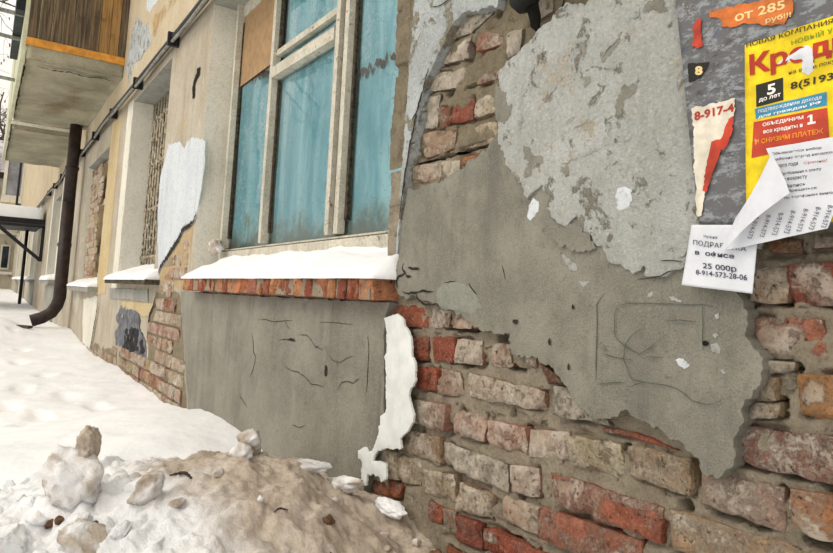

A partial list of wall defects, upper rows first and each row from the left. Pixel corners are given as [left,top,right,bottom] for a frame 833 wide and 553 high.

flaking render [82,137,206,409]
crack [250,319,369,393]
flaking render [387,0,414,256]
crack [396,263,477,306]
peeling [412,0,699,277]
flaking render [358,227,833,553]